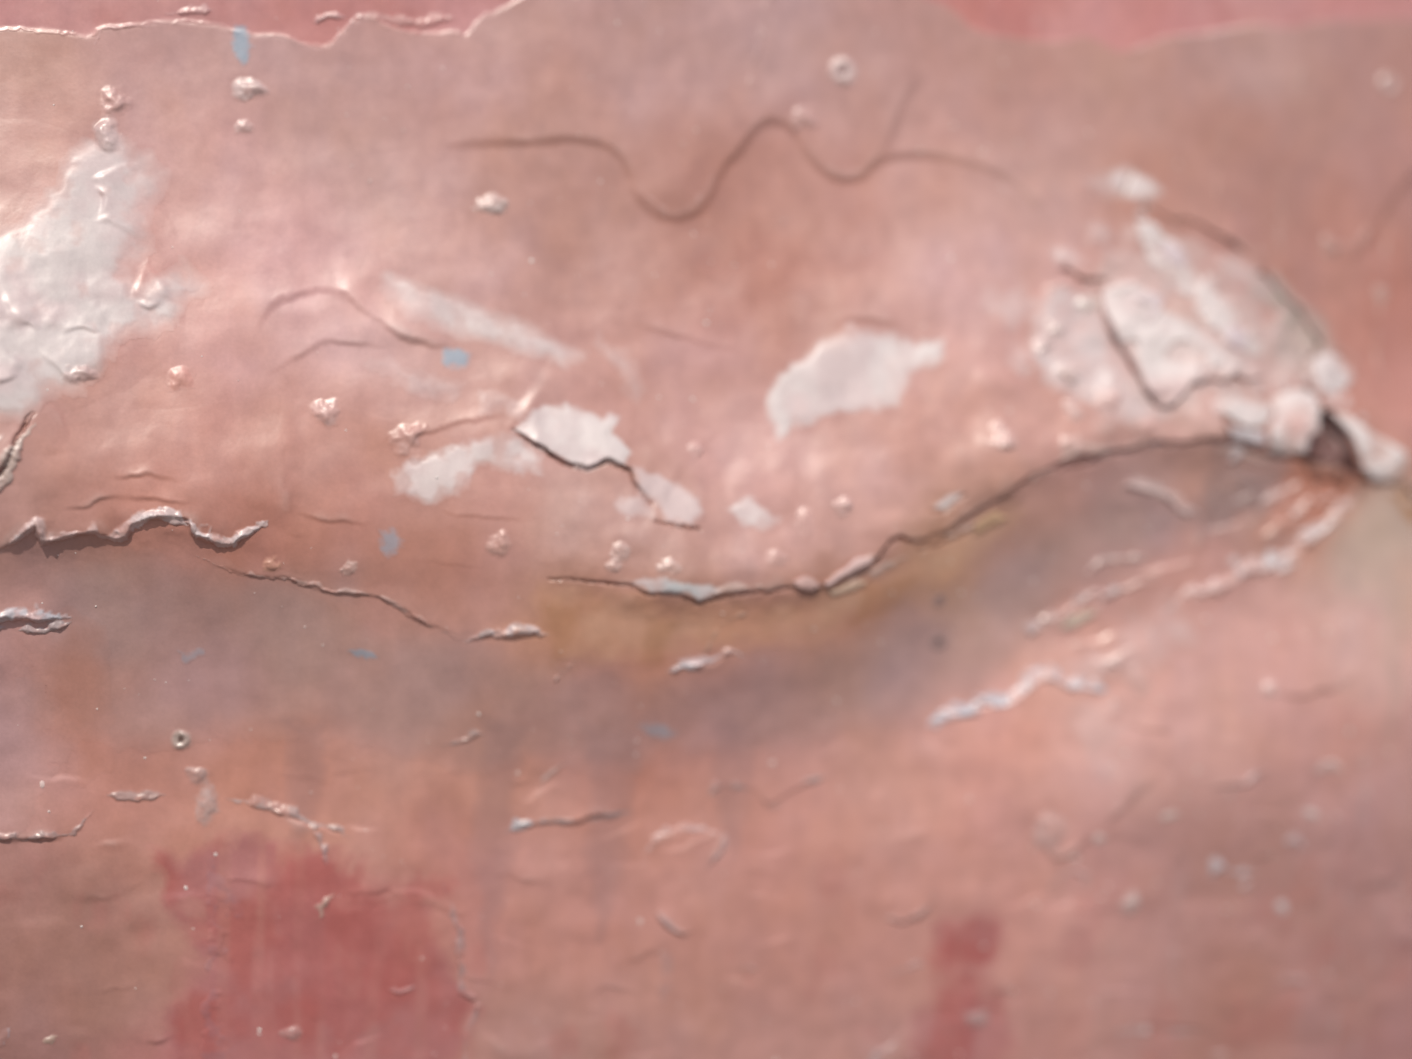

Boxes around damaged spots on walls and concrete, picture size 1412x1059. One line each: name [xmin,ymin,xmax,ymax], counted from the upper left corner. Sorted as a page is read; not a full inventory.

peeling [0,2,232,46]
peeling [249,0,524,49]
peeling [0,116,212,427]
crack [0,412,37,493]
peeling [0,505,550,642]
peeling [363,268,707,531]
crack [512,428,701,530]
peeling [726,495,783,533]
peeling [764,319,950,444]
crack [548,268,1412,604]
peeling [980,162,1408,614]
peeling [919,659,1126,730]